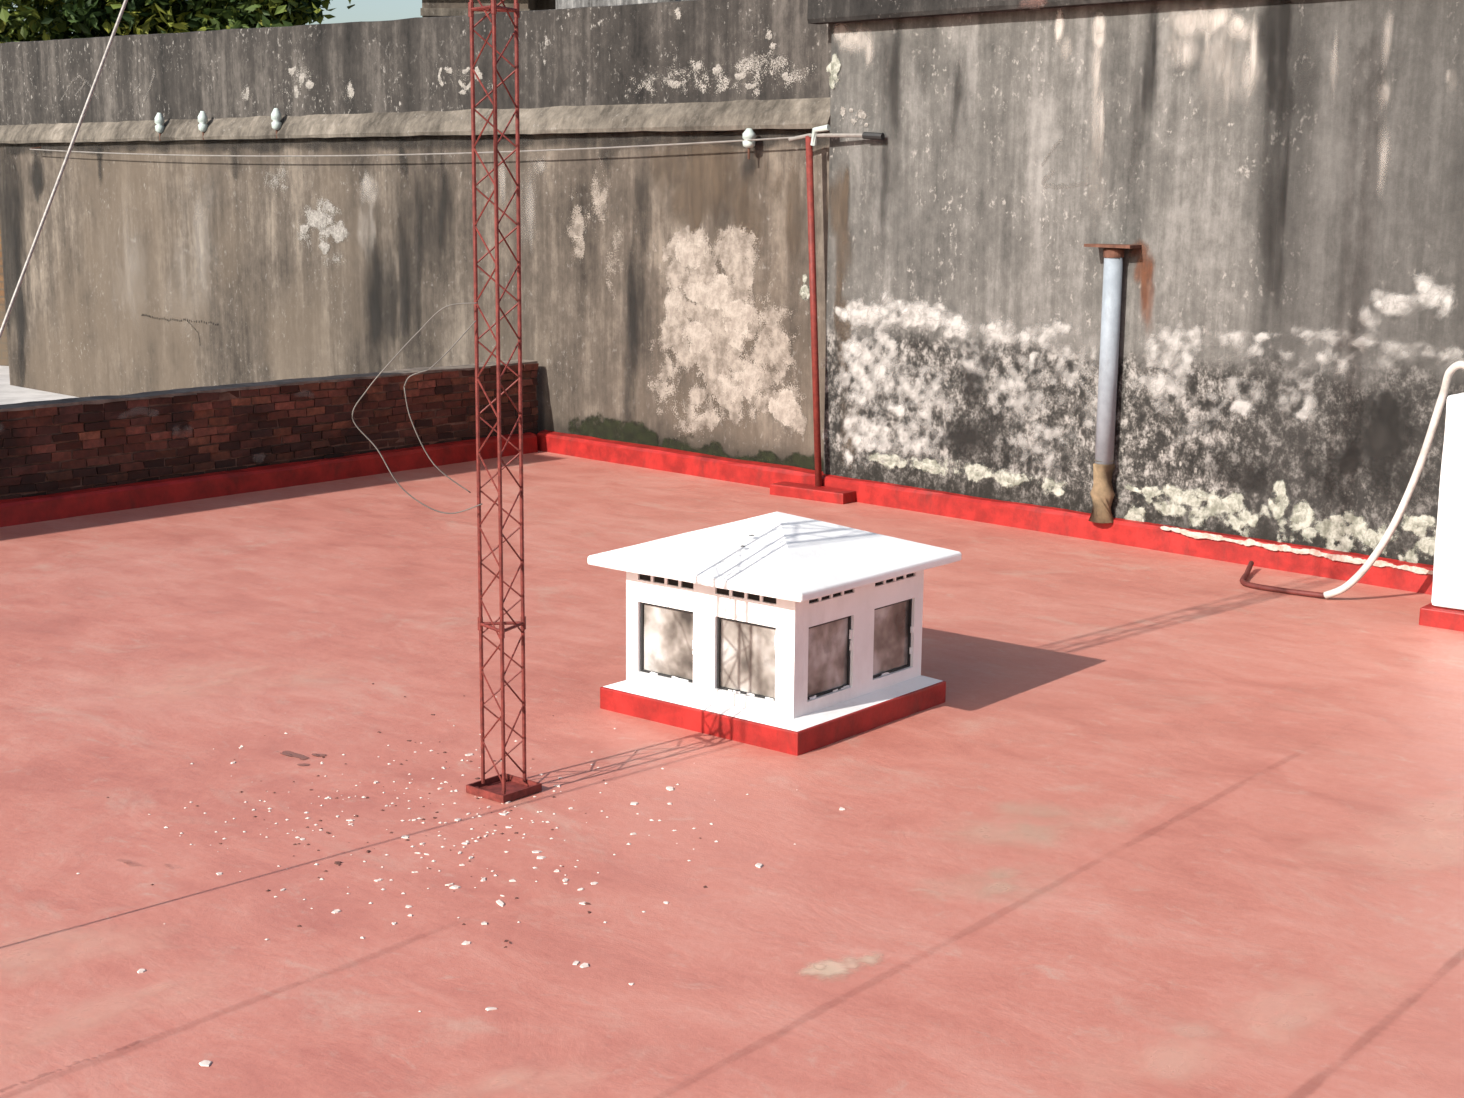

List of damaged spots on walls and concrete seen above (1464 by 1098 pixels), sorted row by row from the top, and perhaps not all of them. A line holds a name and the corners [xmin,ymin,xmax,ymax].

water stain [206,139,322,151]
water stain [351,137,435,168]
water stain [0,141,185,387]
water stain [372,238,406,339]
water stain [826,171,1097,466]
corrosion [1134,243,1153,318]
water stain [1132,323,1201,411]
water stain [1178,378,1263,441]
water stain [1219,466,1266,488]
water stain [1219,331,1269,355]
water stain [1280,330,1408,420]
water stain [1321,394,1411,490]